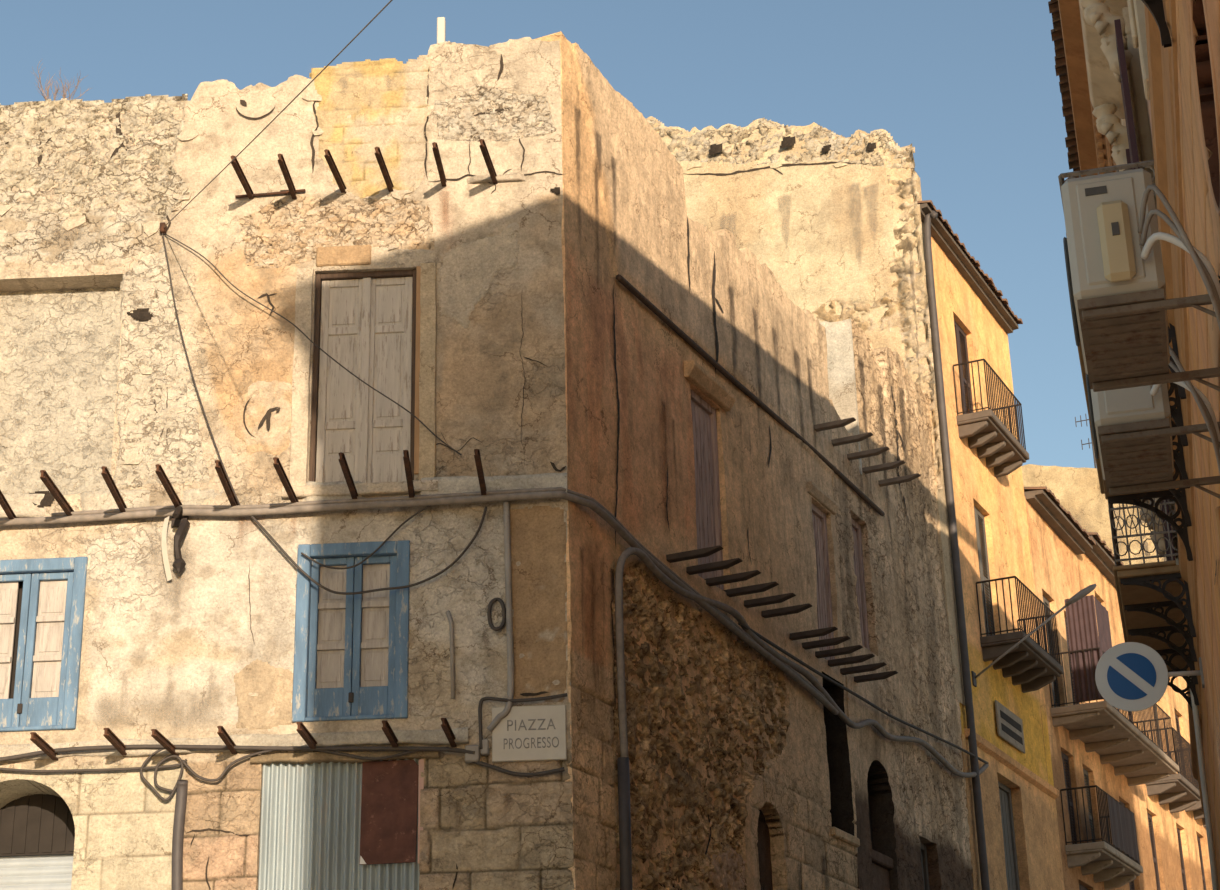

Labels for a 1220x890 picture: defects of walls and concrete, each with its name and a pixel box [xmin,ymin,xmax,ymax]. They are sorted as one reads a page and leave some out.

flaking render [0,94,199,237]
flaking render [239,55,556,328]
flaking render [113,245,211,490]
flaking render [611,559,790,890]